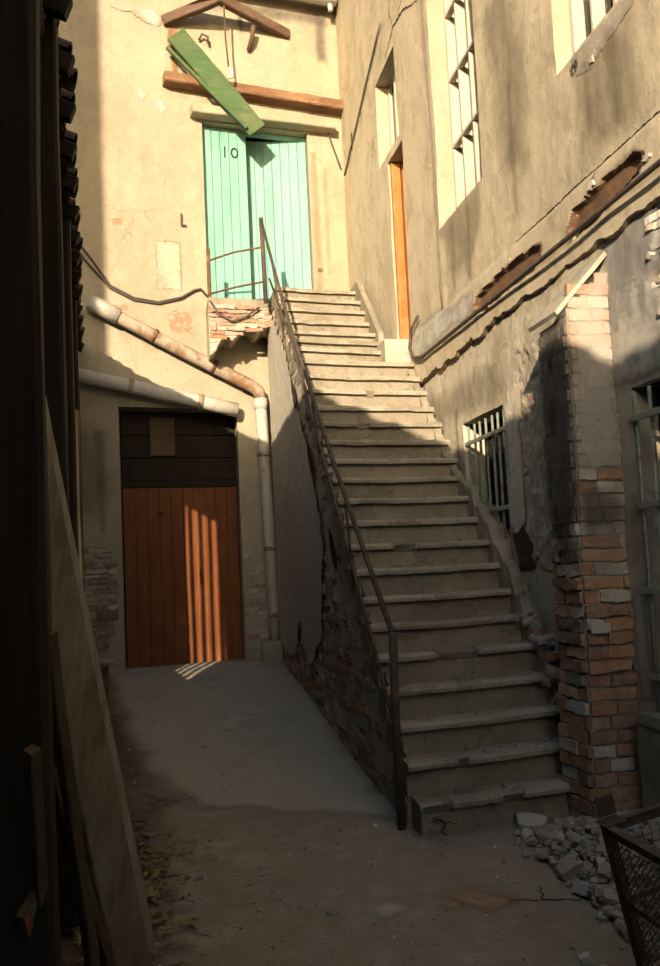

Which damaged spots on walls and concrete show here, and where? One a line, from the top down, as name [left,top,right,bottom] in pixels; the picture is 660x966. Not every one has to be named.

flaking render [644,201,660,260]
spalling [243,320,337,667]
flaking render [83,542,120,673]